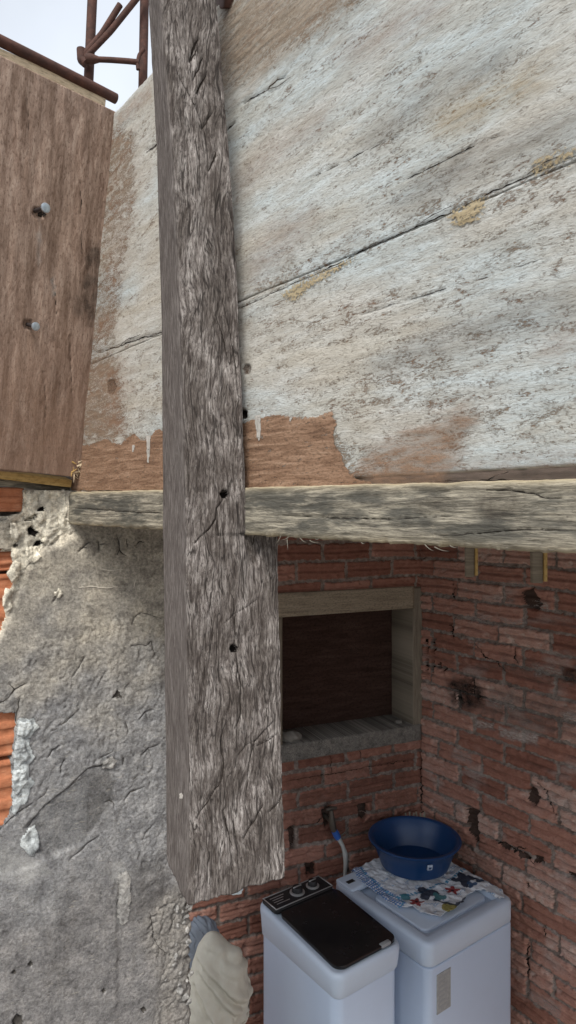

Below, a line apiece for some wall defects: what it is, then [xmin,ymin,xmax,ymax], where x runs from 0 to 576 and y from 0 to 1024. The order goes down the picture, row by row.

crack [216,155,570,391]
peeling [243,412,473,488]
peeling [2,429,163,613]
crack [0,684,24,721]
peeling [12,721,33,795]
crack [1,714,157,828]